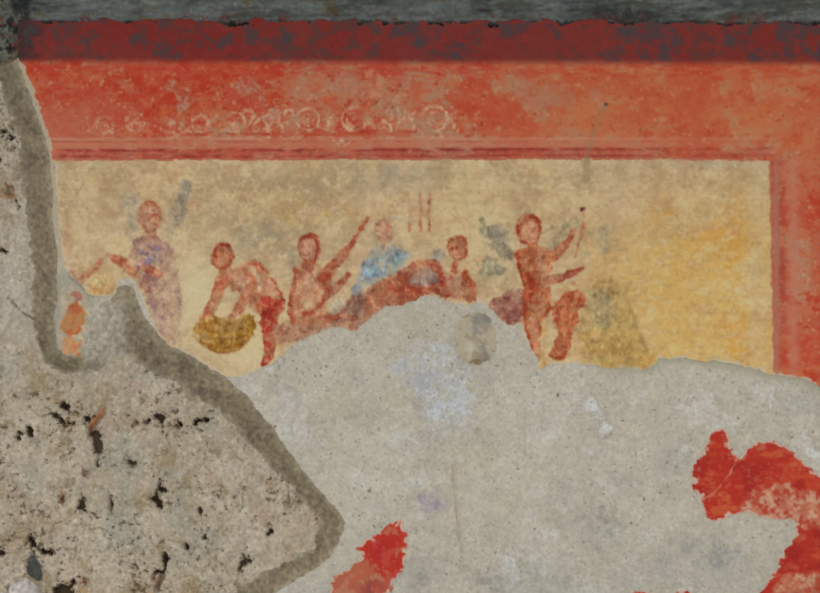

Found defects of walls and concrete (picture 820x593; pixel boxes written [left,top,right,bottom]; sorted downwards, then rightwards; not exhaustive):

peeling [55,279,94,359]
spalling [130,410,214,429]
spalling [14,424,35,443]
spalling [48,400,106,468]
spalling [74,491,115,518]
spalling [148,477,180,511]
peeling [734,478,820,533]
spalling [26,532,55,558]
spalling [51,577,77,593]
spalling [150,551,171,593]
spalling [234,550,255,577]
peeling [769,568,820,593]